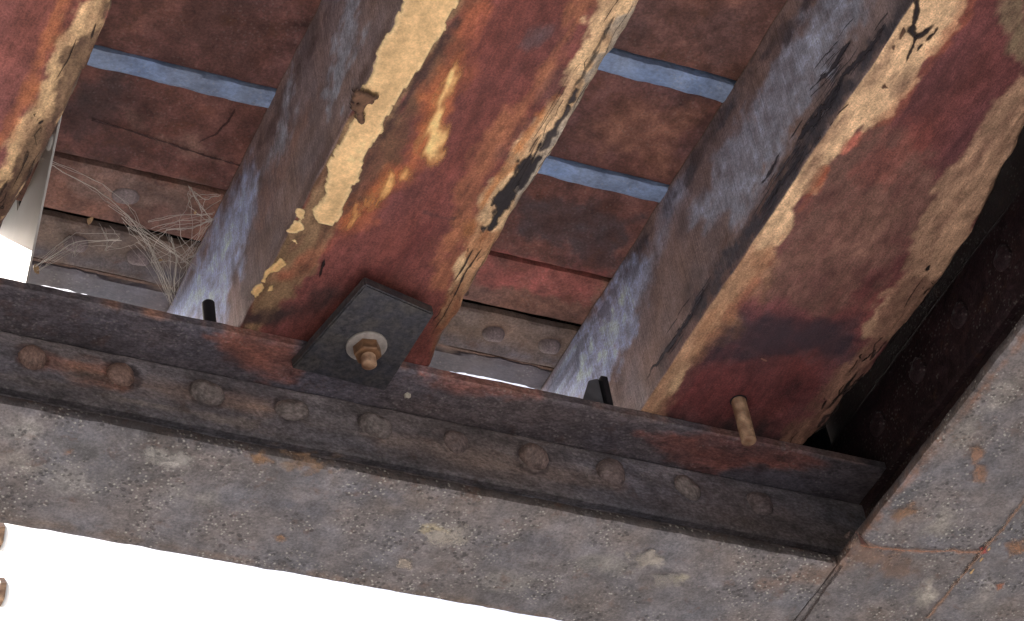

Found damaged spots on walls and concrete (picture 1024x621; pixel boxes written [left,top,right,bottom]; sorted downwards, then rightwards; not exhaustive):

peeling [286,0,459,244]
crack [510,0,632,199]
crack [434,242,494,327]